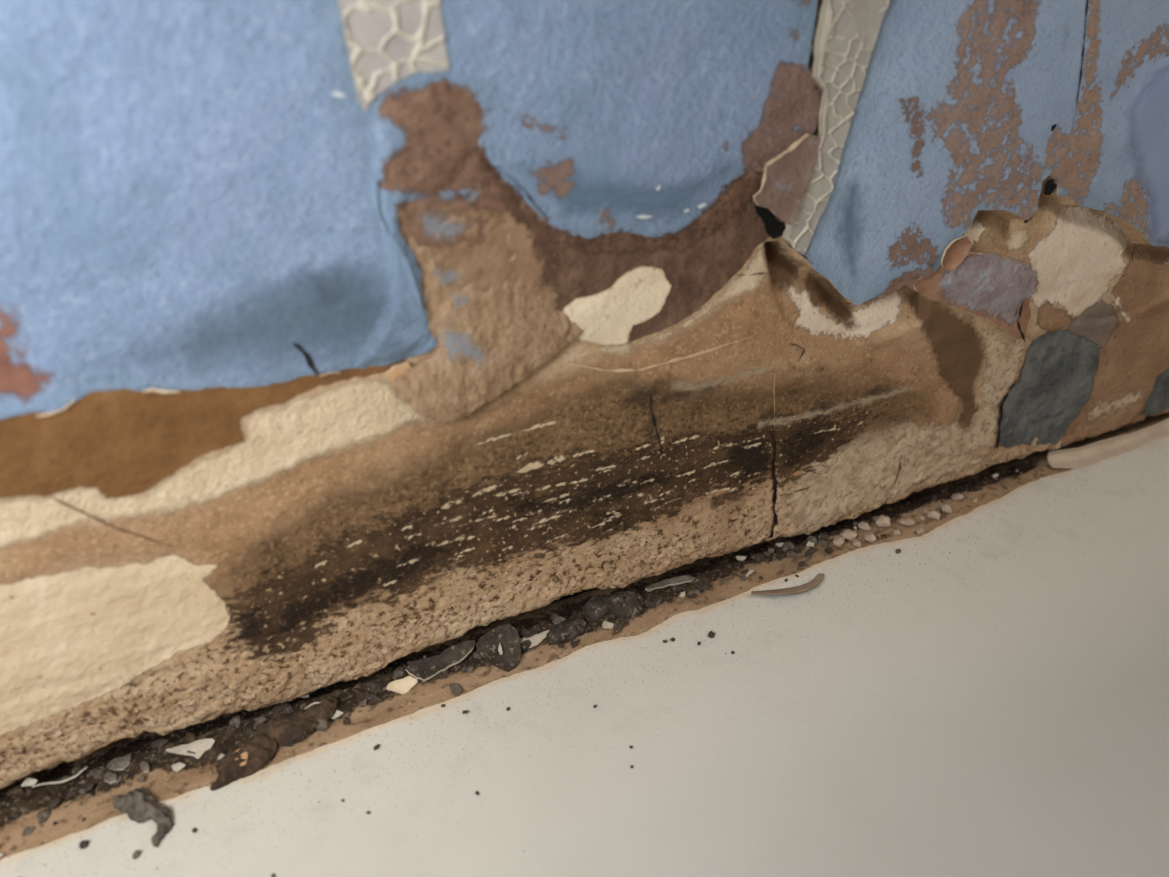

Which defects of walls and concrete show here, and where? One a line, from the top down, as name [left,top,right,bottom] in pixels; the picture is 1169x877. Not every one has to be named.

crack [338,0,449,112]
peeling [378,61,938,354]
crack [782,0,890,265]
peeling [900,0,1169,469]
crack [50,496,174,547]
peeling [0,311,431,547]
damp [0,266,984,768]
crack [769,344,822,538]
flaking render [0,555,230,735]
peeling [165,738,215,760]